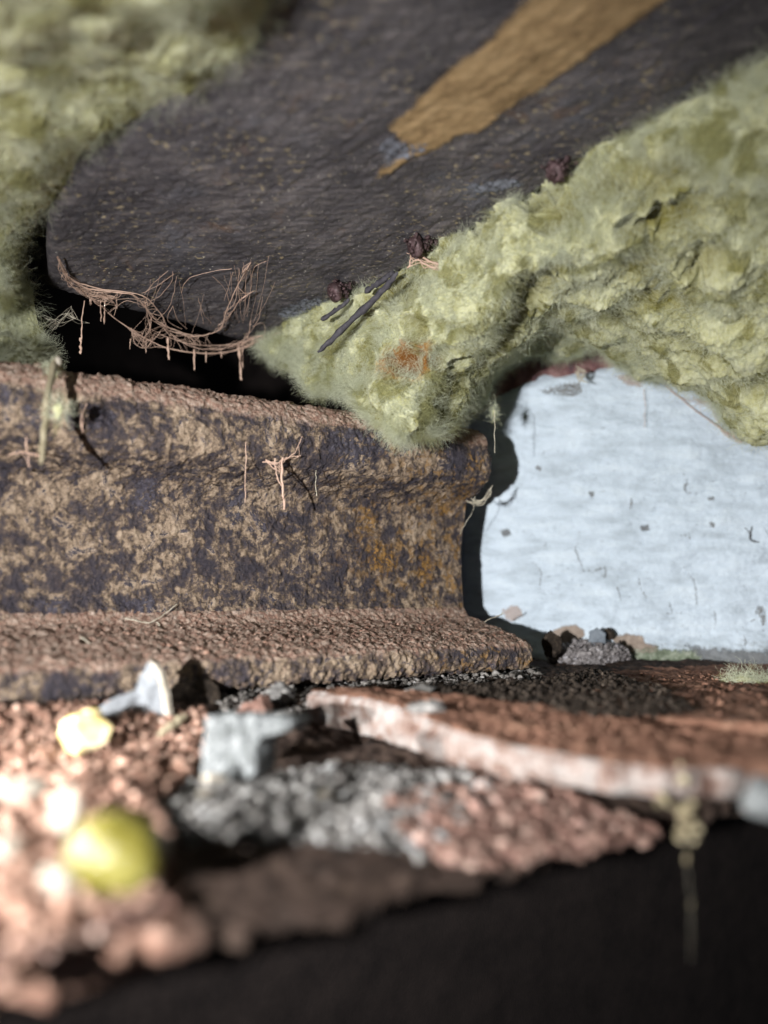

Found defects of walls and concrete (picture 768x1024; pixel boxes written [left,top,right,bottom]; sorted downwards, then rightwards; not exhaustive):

corrosion [357,507,396,578]